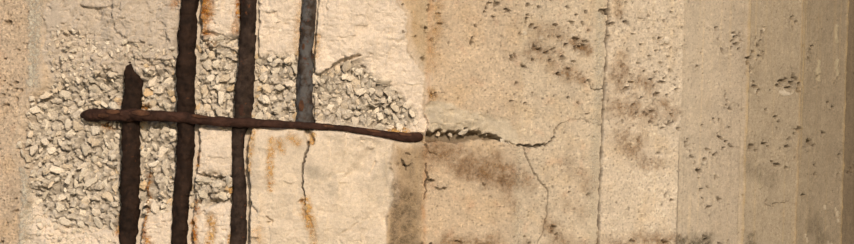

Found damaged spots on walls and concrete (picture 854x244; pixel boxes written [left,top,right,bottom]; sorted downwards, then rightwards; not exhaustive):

spalling [0,0,182,244]
corrosion [190,202,215,244]
corrosion [200,0,212,35]
spalling [187,0,241,244]
corrosion [267,132,315,191]
crack [301,141,313,227]
spalling [244,0,521,244]
crack [516,4,611,244]